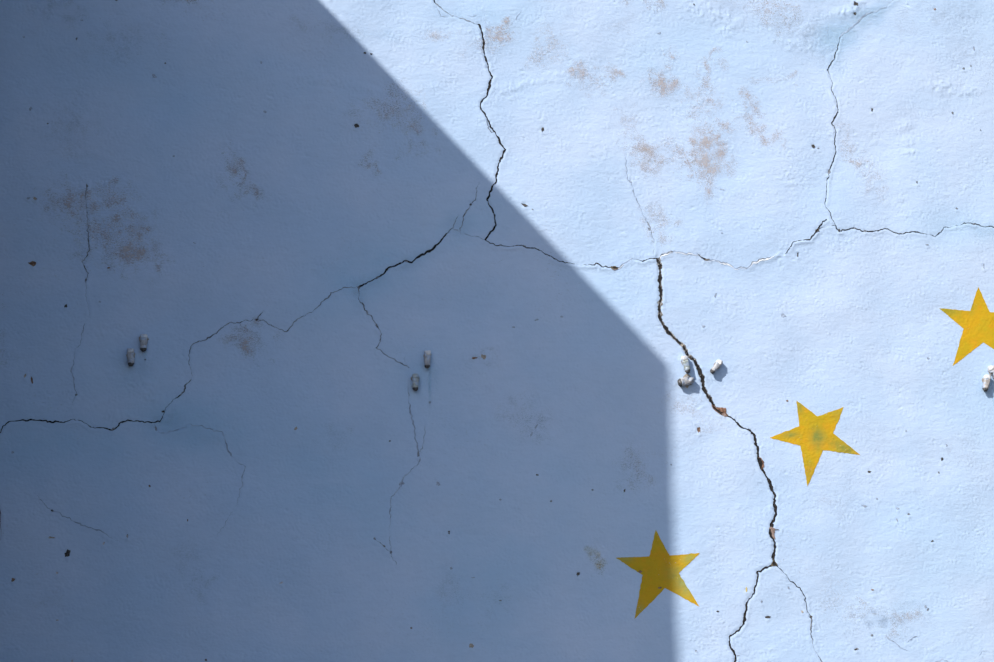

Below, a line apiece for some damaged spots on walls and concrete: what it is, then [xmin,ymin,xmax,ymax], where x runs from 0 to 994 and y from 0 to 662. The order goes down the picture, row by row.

crack [0,0,949,530]
crack [726,414,822,662]